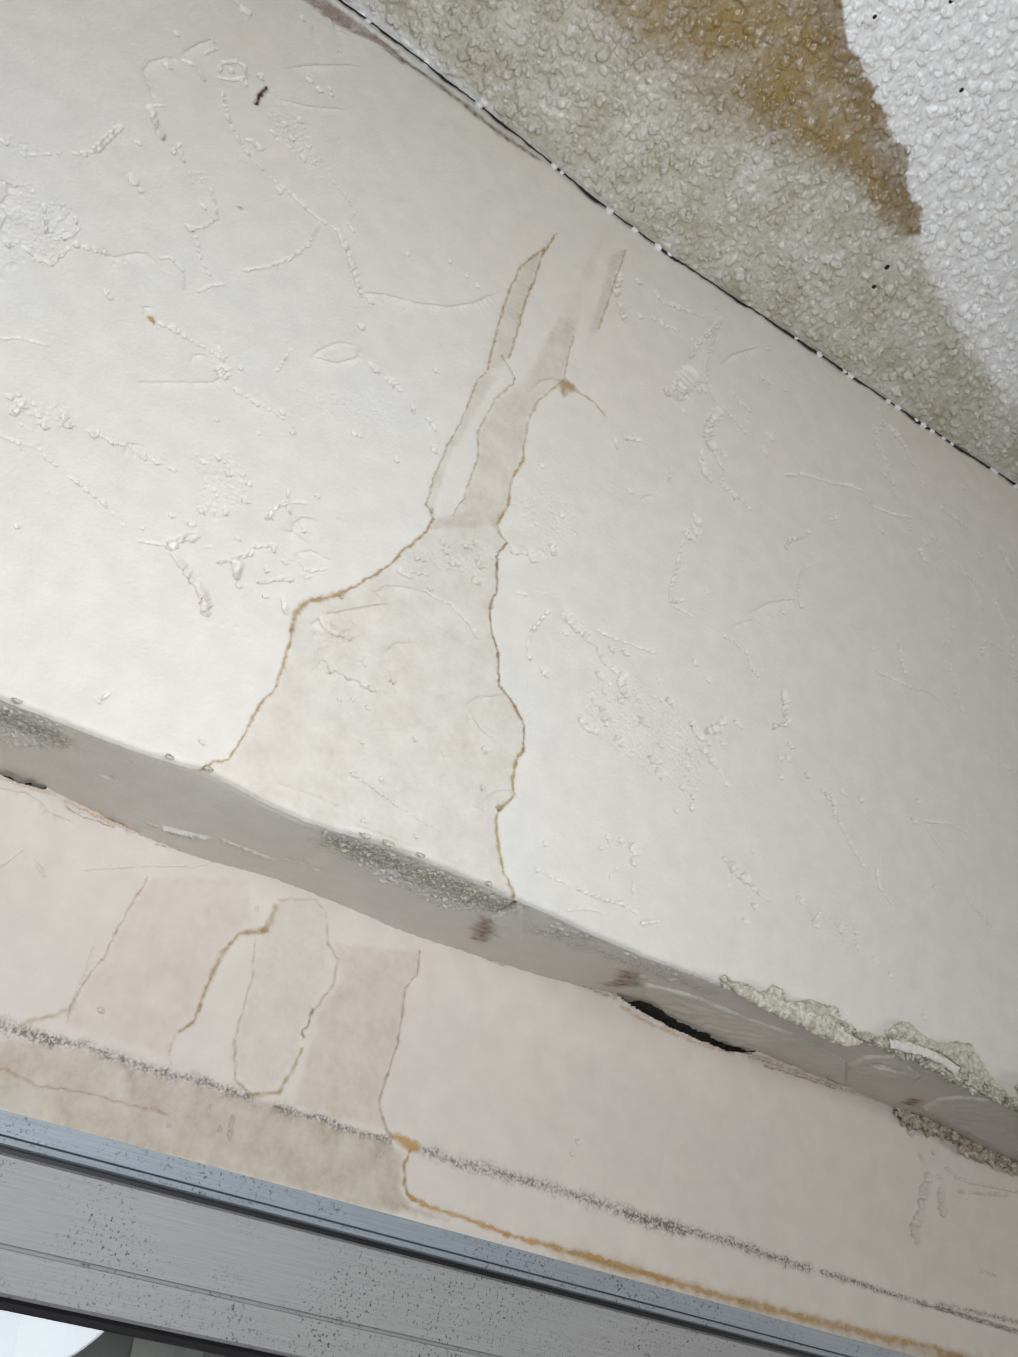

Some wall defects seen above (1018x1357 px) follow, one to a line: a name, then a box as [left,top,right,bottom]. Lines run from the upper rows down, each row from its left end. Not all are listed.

crack [0,119,324,295]
crack [98,285,248,394]
crack [339,0,1016,485]
water stain [628,0,914,207]
spalling [136,526,351,643]
crack [262,485,348,552]
spalling [555,602,747,817]
peeling [316,829,947,1146]
crack [0,1012,1018,1337]
peeling [888,1021,1018,1168]